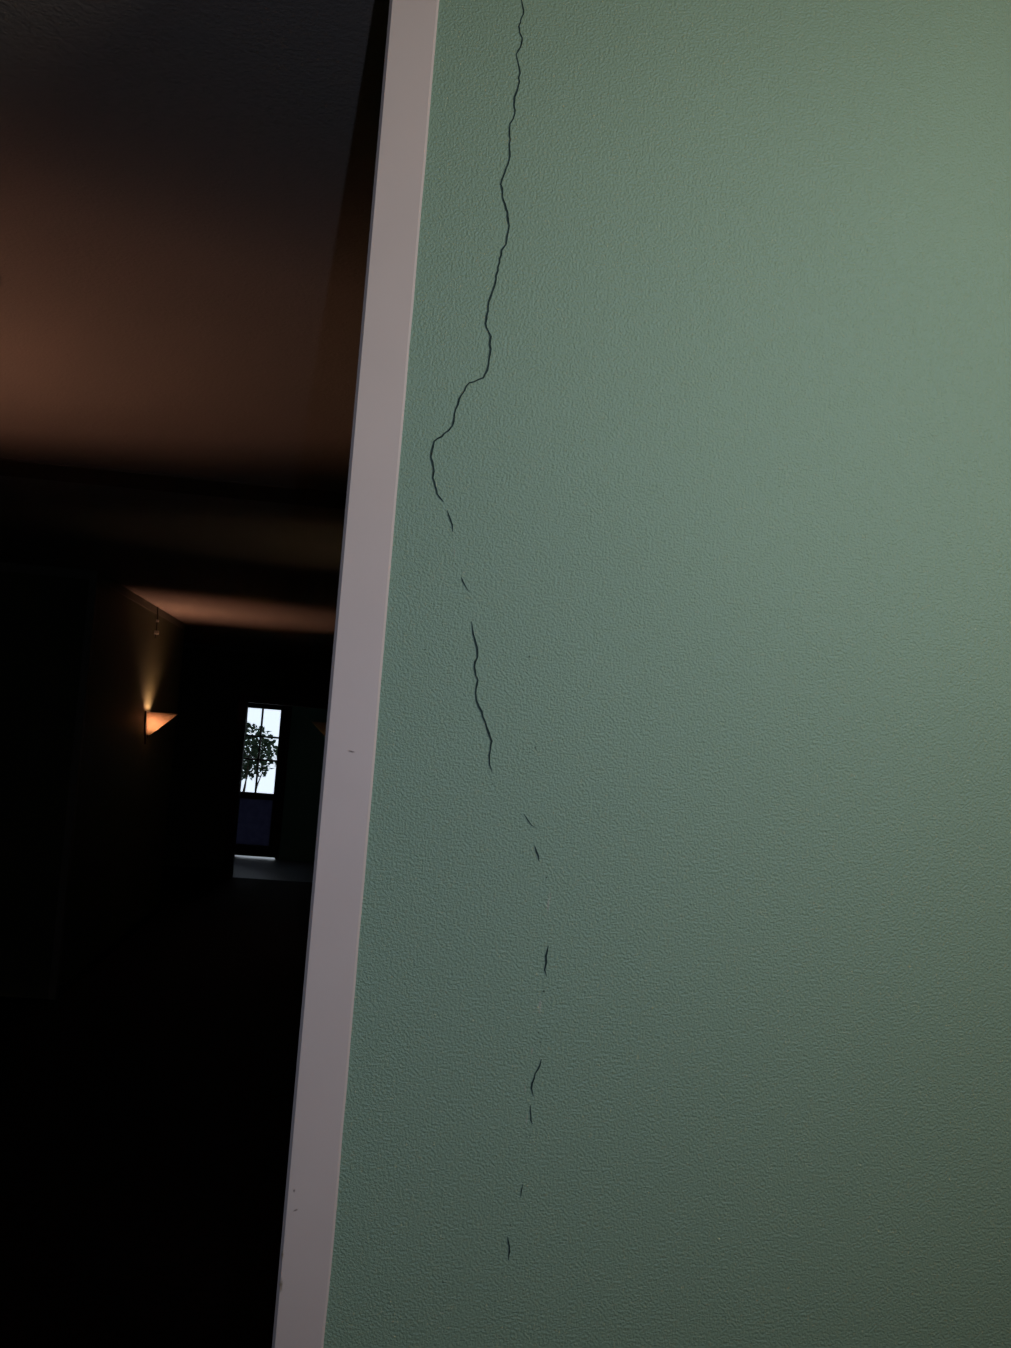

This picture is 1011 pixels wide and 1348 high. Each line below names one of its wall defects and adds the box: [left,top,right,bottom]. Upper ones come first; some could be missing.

crack [430,0,524,531]
crack [472,625,493,771]
crack [527,1032,541,1137]